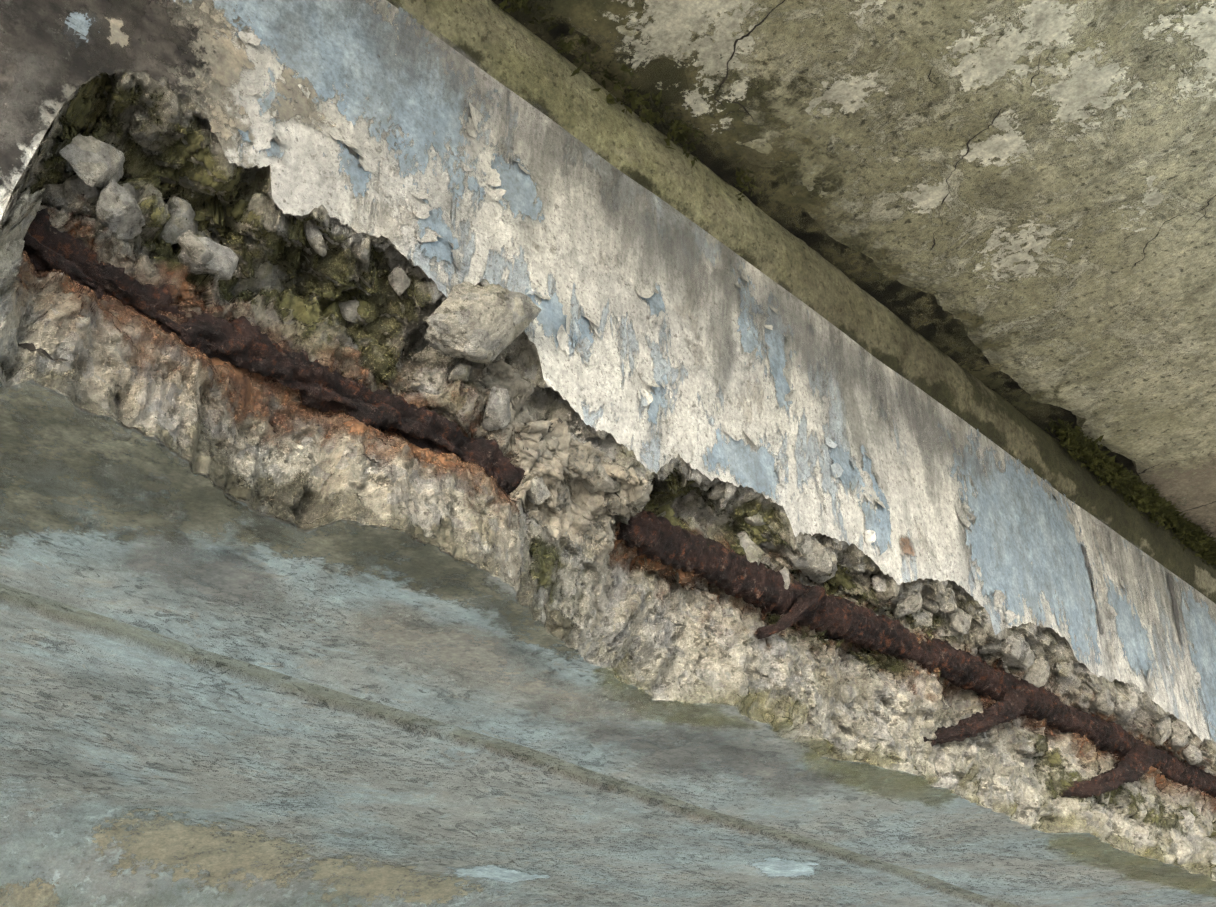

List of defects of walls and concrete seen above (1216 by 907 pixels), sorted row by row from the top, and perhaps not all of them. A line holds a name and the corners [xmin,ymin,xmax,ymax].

peeling [65,11,130,48]
flaking render [603,0,768,133]
crack [714,0,785,123]
flaking render [941,0,1216,167]
peeling [170,0,502,272]
flaking render [973,212,1077,290]
crack [1130,195,1216,273]
corrosion [14,194,521,522]
corrosion [610,523,719,615]
corrosion [900,537,915,556]
corrosion [781,623,962,701]
corrosion [998,716,1121,768]